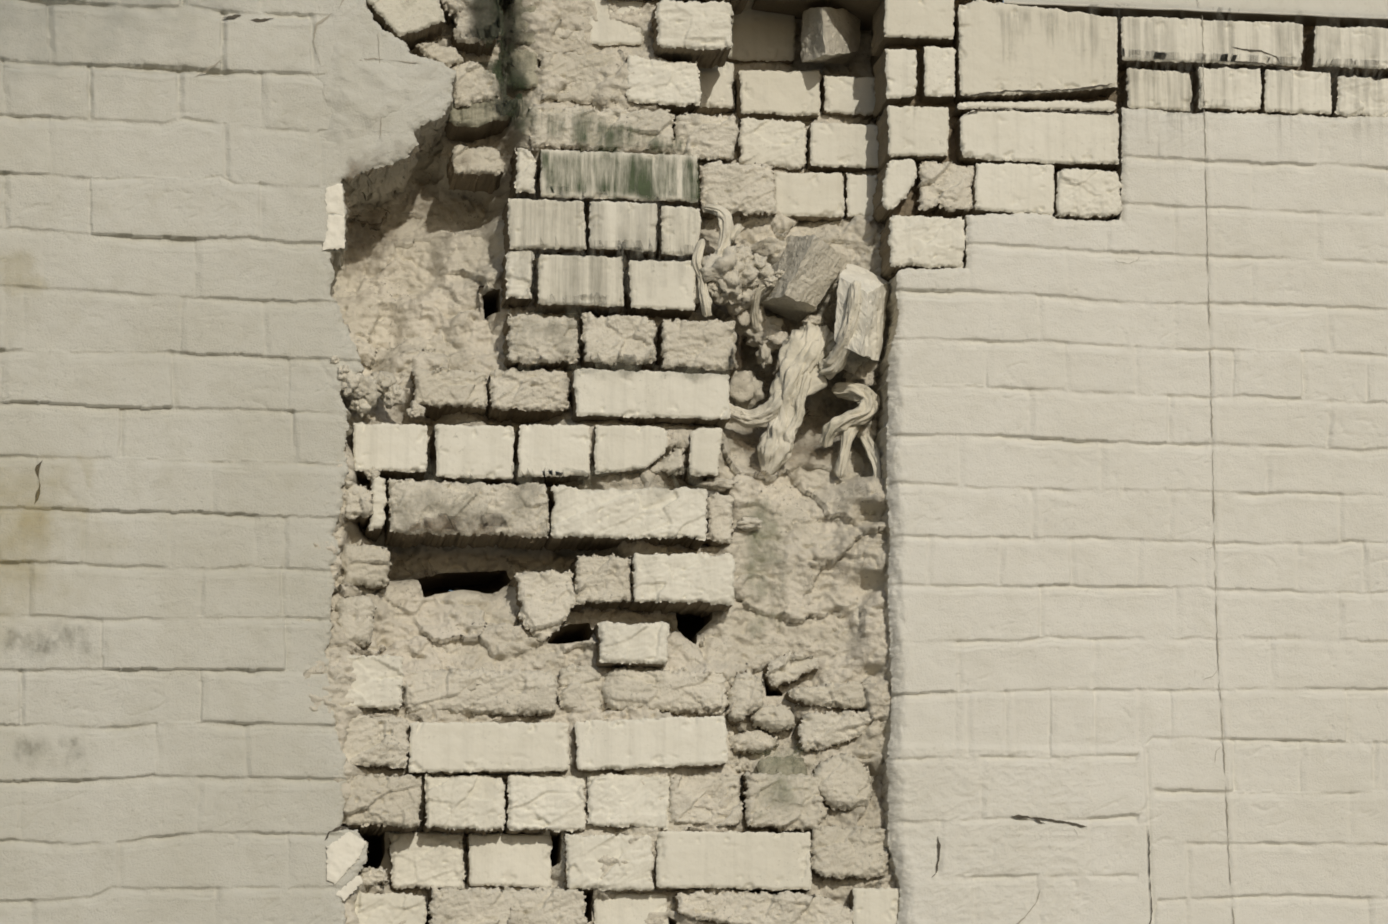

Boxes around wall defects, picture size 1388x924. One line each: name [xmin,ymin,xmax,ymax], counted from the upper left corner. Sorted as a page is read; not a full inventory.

spalling [303,0,899,924]
crack [1012,815,1087,833]